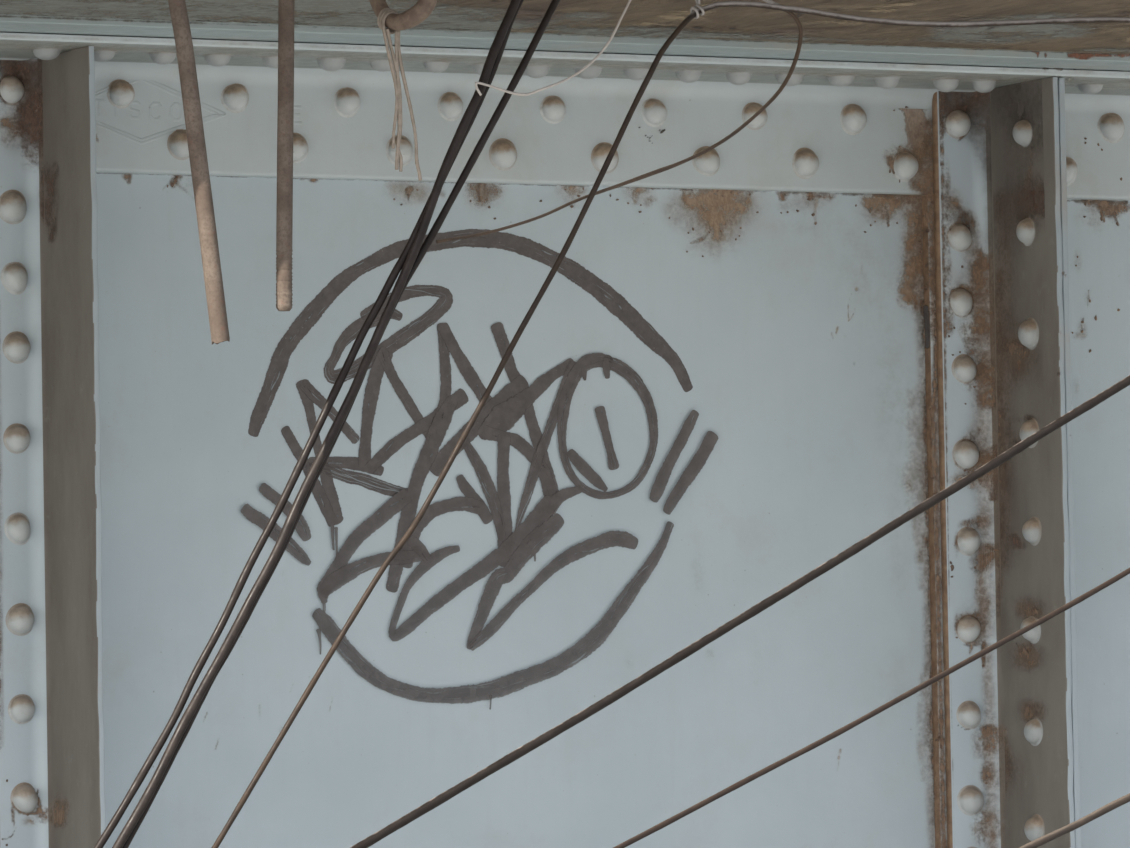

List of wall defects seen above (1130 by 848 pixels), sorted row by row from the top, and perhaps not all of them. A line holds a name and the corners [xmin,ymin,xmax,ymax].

corrosion [1,60,58,241]
corrosion [468,183,501,220]
corrosion [682,189,759,257]
corrosion [855,91,1029,848]
corrosion [2,791,53,846]